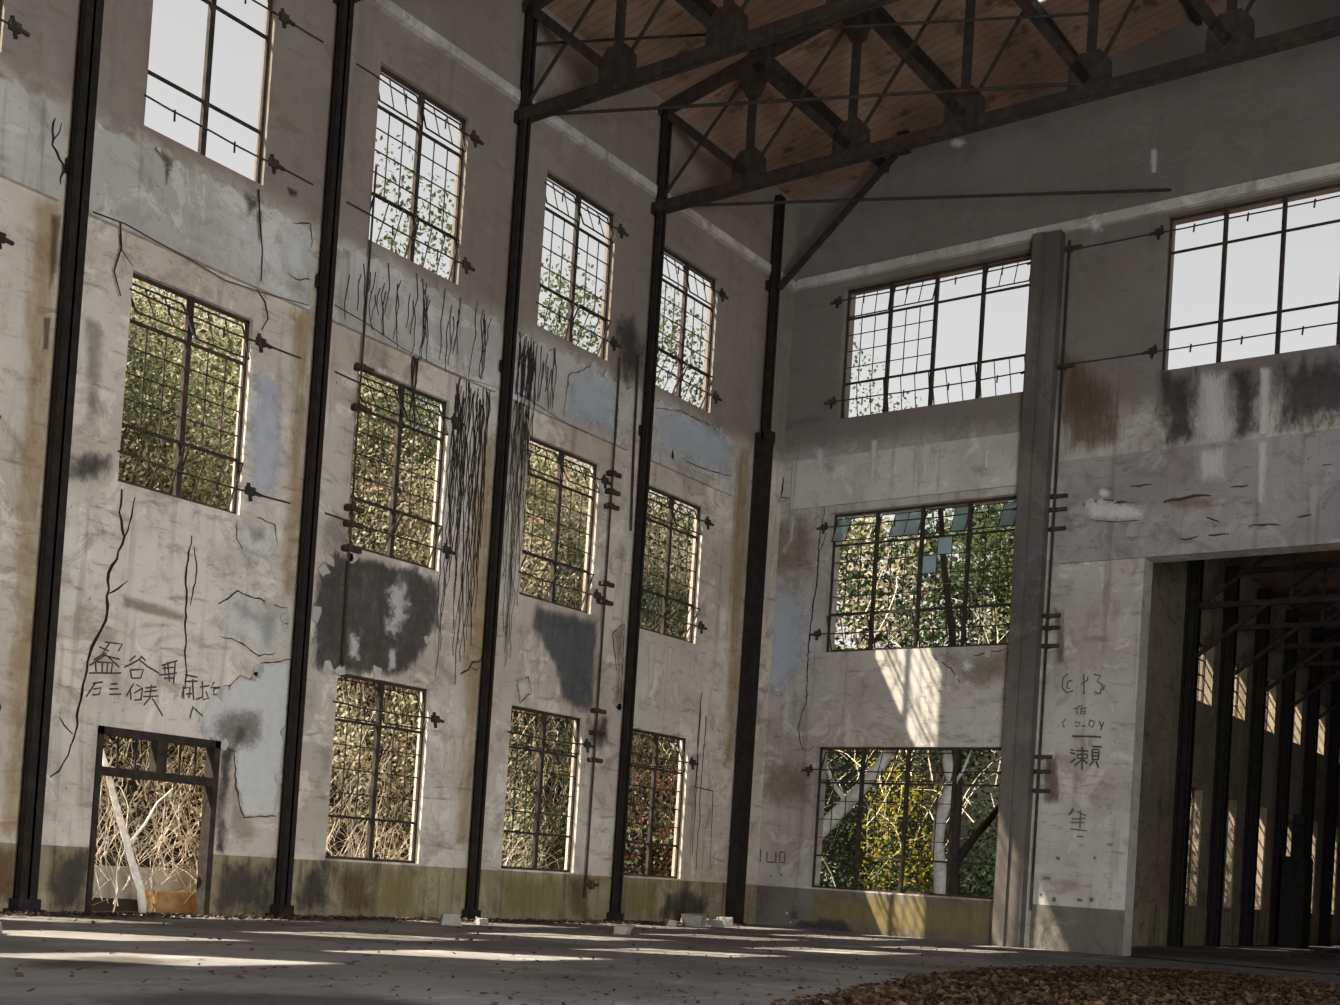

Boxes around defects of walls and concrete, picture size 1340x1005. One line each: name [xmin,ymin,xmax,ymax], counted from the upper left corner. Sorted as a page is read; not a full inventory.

leakage [1161,363,1340,503]
crack [50,489,135,777]
crack [181,536,197,698]
leakage [311,552,438,680]
leakage [534,609,596,708]
leakage [52,852,89,912]
leakage [297,863,328,910]